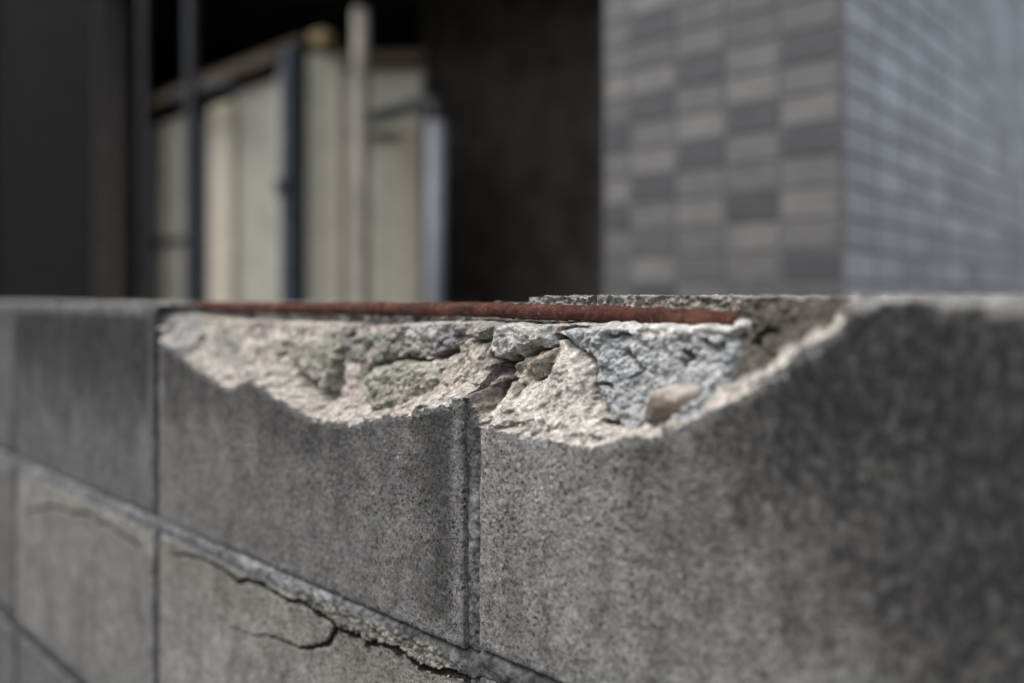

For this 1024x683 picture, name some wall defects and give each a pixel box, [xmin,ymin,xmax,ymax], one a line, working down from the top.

rust [193,301,744,326]
spalling [155,294,857,448]
crack [176,553,471,683]